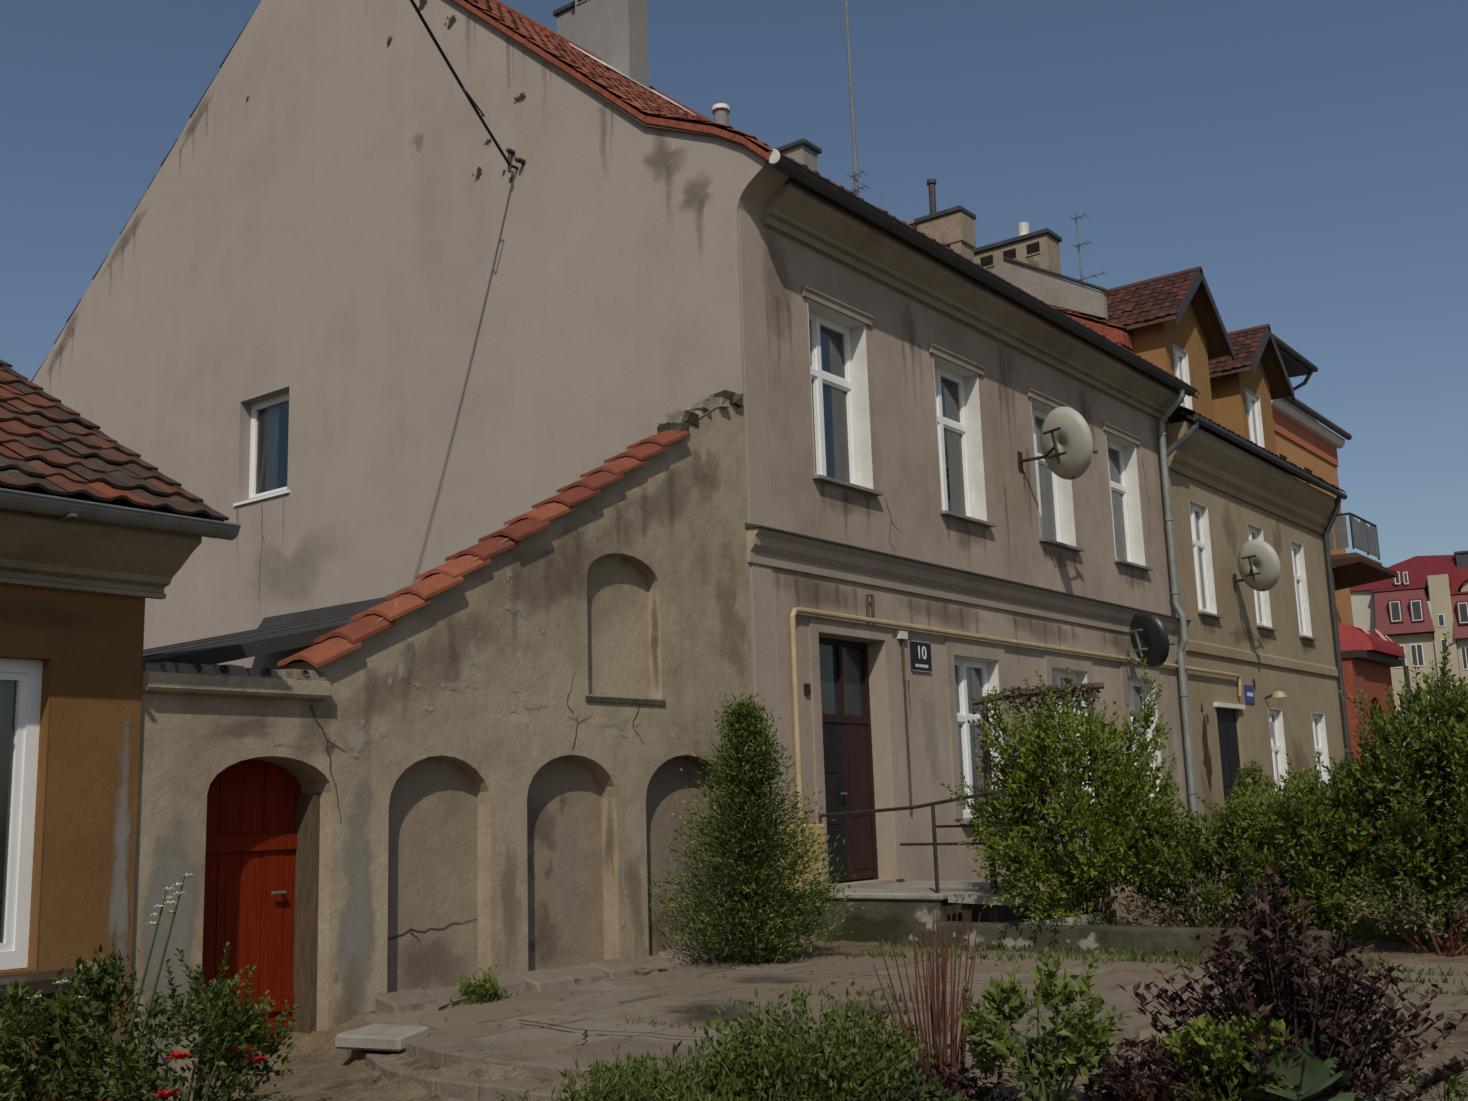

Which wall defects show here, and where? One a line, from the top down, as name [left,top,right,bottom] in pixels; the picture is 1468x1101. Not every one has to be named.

crack [567,672,593,750]
crack [310,705,348,819]
crack [388,919,476,940]